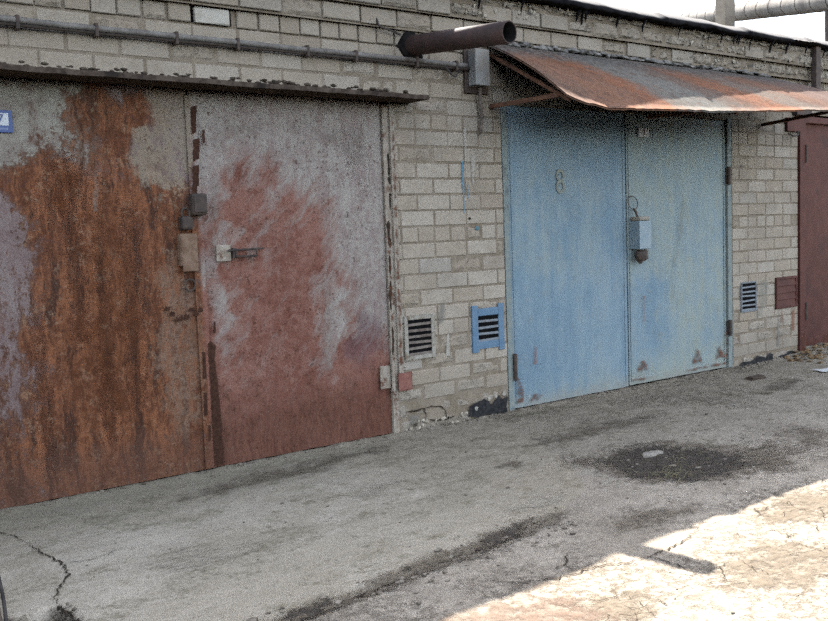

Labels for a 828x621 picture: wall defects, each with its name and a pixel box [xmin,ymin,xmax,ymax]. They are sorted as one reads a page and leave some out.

crack [0,532,120,606]
crack [280,511,569,621]
crack [555,590,668,621]
crack [467,476,828,595]